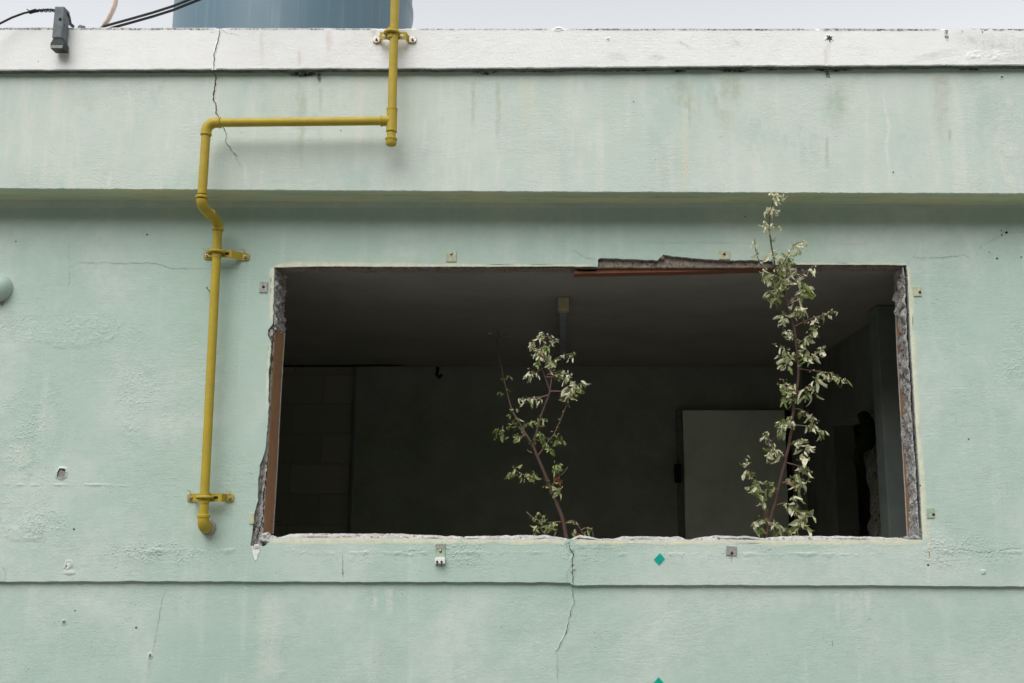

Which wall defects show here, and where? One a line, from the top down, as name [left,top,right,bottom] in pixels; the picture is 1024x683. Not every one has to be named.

crack [211,28,240,164]
peeling [55,466,68,481]
spalling [250,256,921,562]
crack [555,541,608,678]